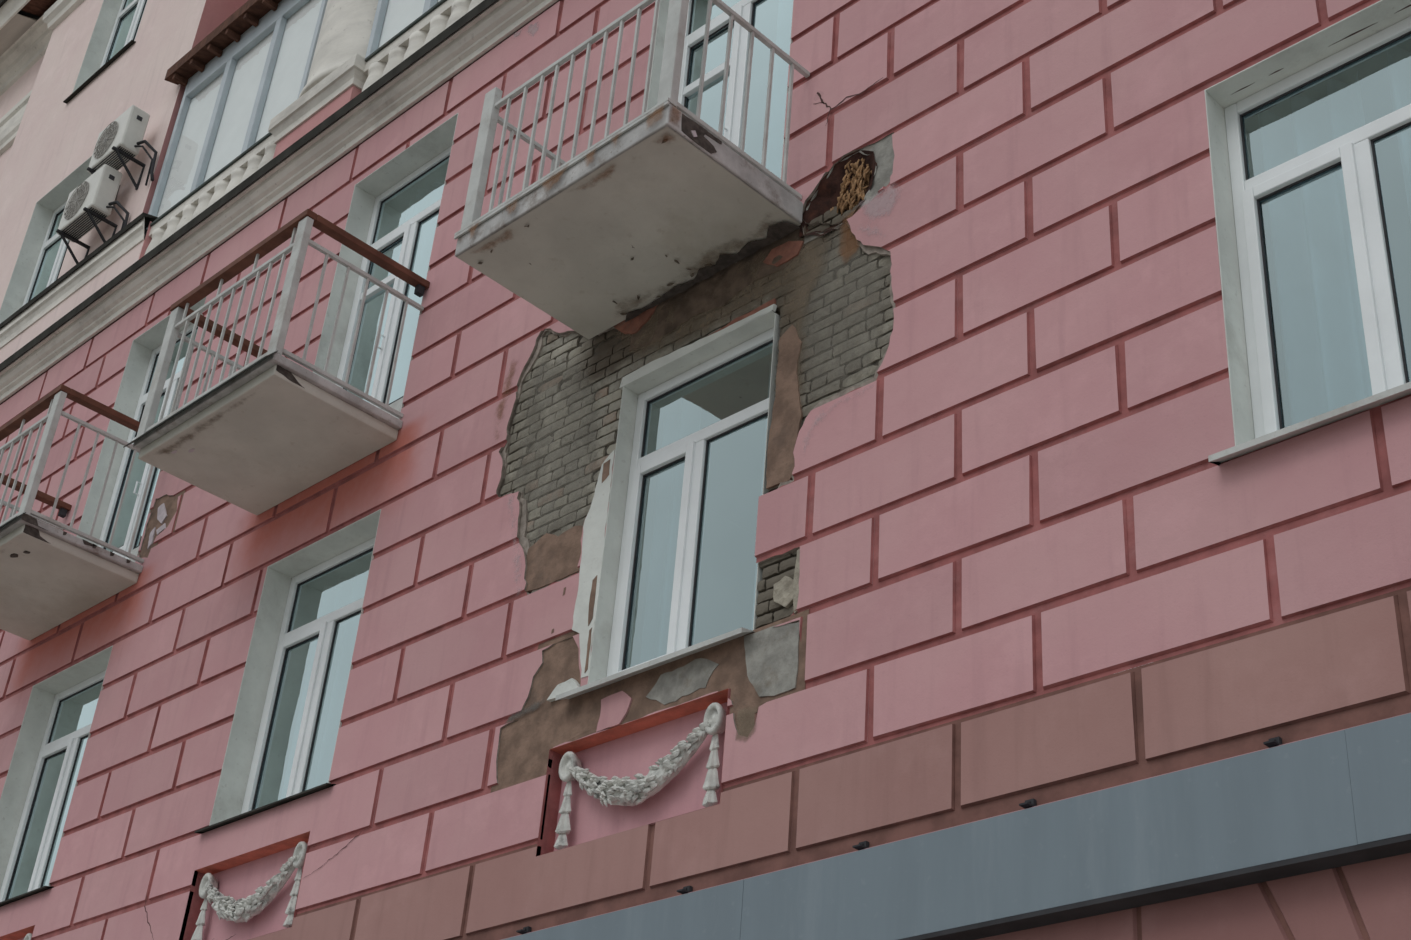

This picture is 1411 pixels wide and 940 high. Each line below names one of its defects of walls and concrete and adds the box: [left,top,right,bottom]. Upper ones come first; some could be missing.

flaking render [490,205,895,793]